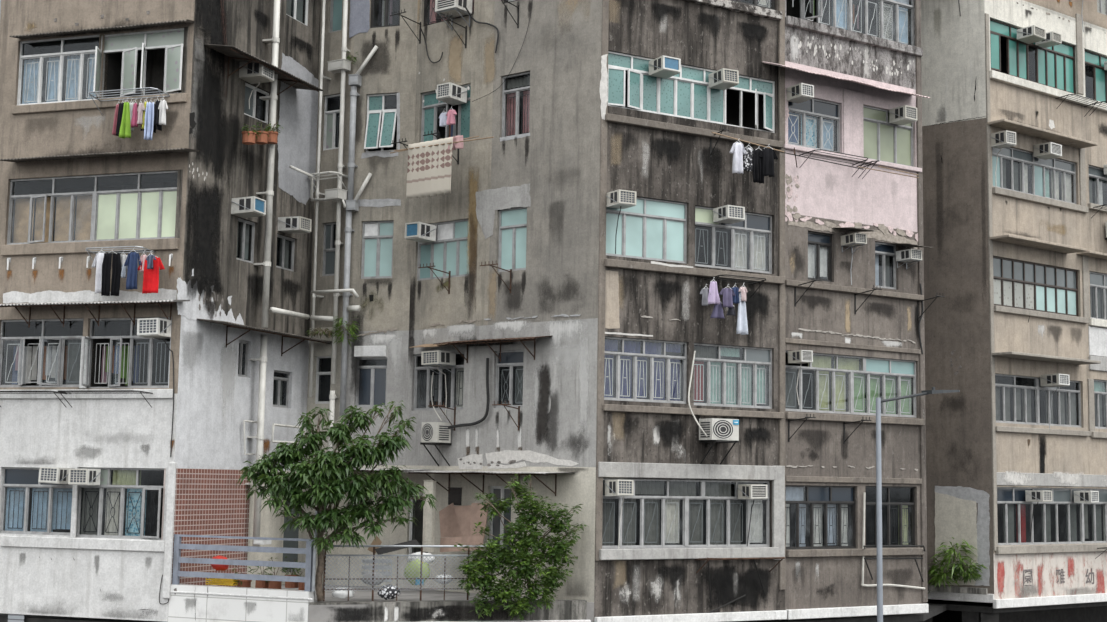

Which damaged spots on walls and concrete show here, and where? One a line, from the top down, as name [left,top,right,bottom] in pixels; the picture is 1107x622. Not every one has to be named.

water stain [652,3,681,23]
water stain [698,13,720,36]
water stain [739,22,767,42]
water stain [655,280,682,303]
water stain [745,292,768,322]
water stain [907,306,919,335]
water stain [545,320,588,421]
water stain [535,364,558,450]
water stain [653,421,683,448]
water stain [744,427,770,446]
water stain [651,565,686,597]
water stain [702,566,770,607]